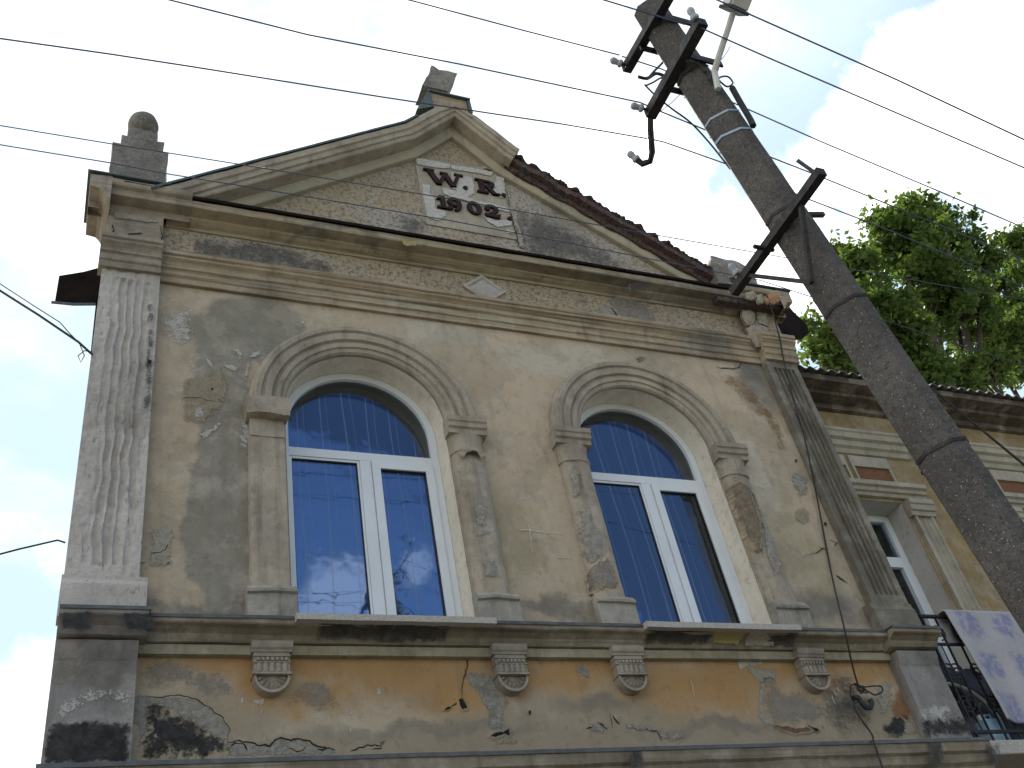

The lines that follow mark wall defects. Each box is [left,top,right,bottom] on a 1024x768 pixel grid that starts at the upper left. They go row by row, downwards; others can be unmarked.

leakage [230,127,697,281]
flaking render [713,291,787,349]
flaking render [183,350,261,423]
flaking render [725,481,763,554]
flaking render [584,557,619,595]
flaking render [133,696,335,756]
crack [141,688,385,752]
flaking render [442,672,517,744]
crack [626,721,685,741]
flaking render [737,662,824,737]